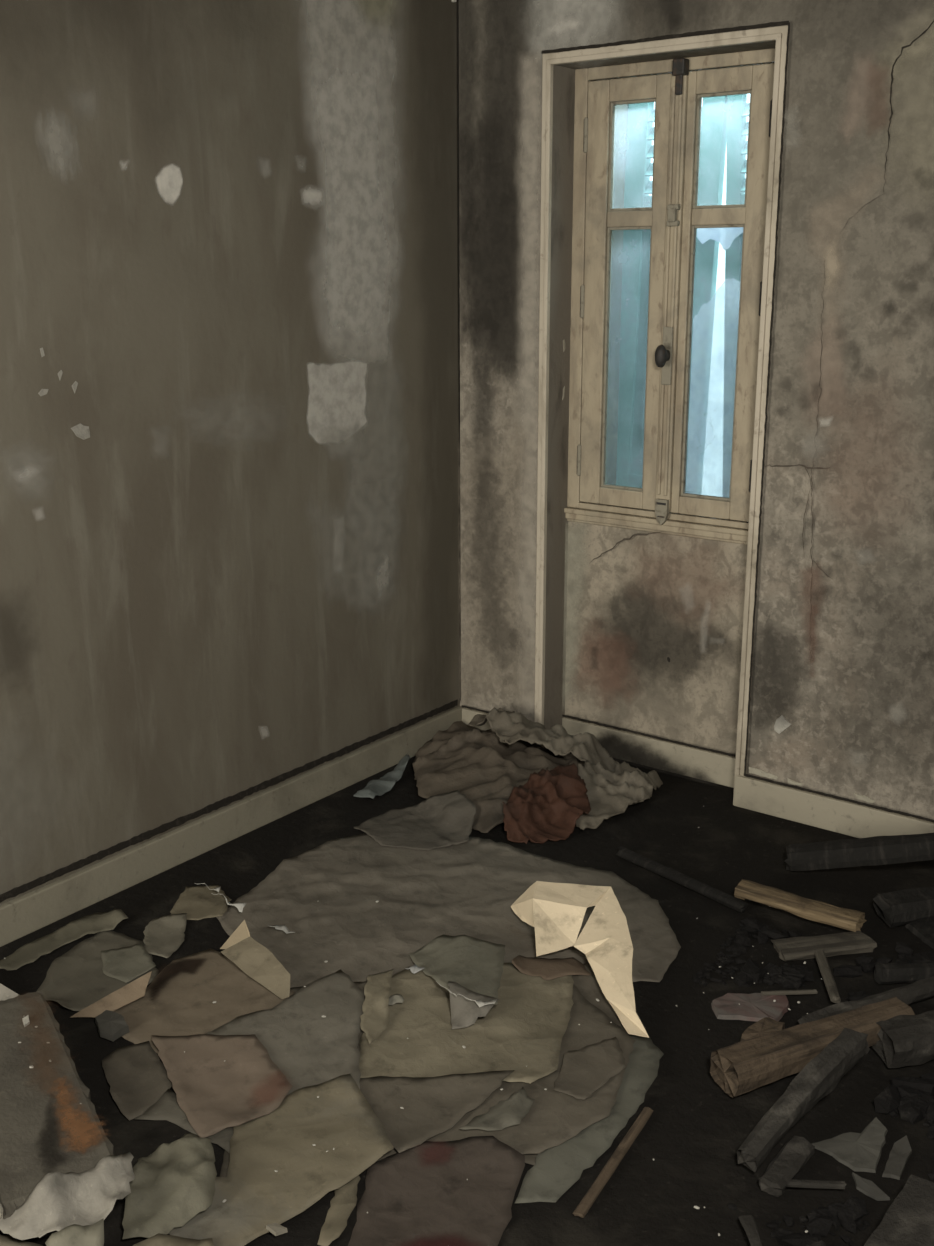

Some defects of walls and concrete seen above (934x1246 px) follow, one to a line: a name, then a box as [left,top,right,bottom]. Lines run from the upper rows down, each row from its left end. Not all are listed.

flaking render [156,164,183,204]
water stain [307,0,398,444]
peeling [38,370,78,396]
peeling [71,423,90,440]
crack [541,20,934,822]
water stain [614,591,707,671]